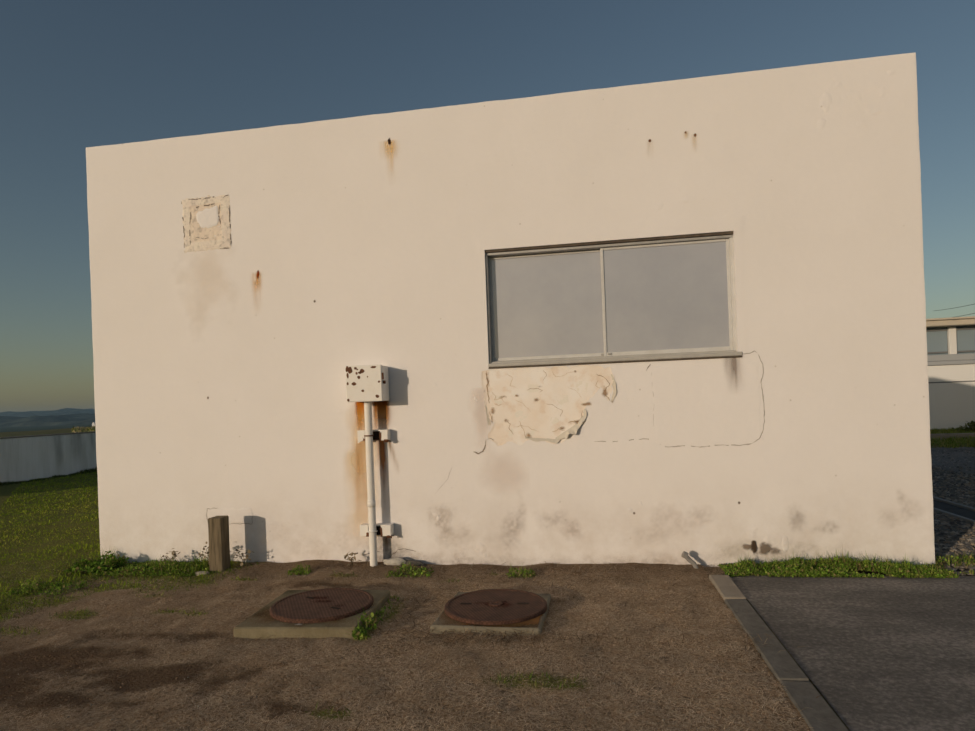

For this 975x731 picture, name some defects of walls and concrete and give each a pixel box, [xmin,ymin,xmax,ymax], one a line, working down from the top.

rust [356,401,388,423]
peeling [481,365,617,446]
rust [379,440,391,477]